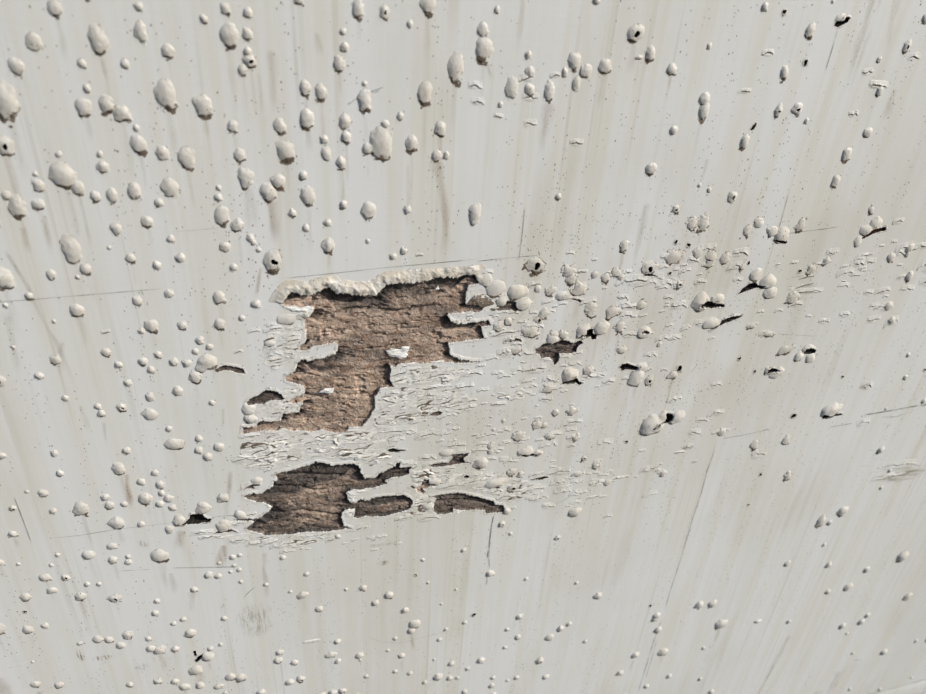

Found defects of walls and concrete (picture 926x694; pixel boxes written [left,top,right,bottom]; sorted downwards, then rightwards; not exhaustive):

peeling [239,264,506,435]
spalling [182,514,212,526]
peeling [233,448,511,537]